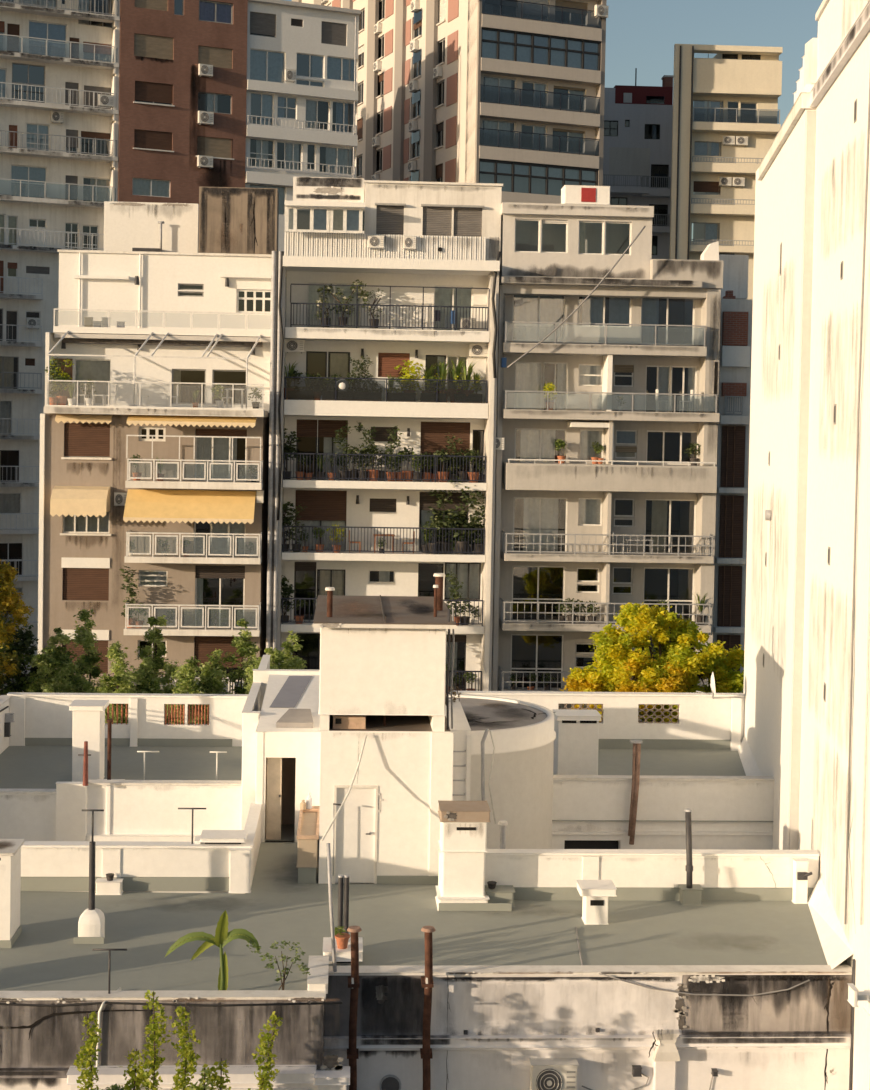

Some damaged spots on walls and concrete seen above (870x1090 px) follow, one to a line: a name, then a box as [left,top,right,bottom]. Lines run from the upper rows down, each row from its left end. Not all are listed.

leakage [200,161,275,253]
leakage [510,261,720,286]
leakage [360,978,449,1055]
leakage [685,975,847,1043]